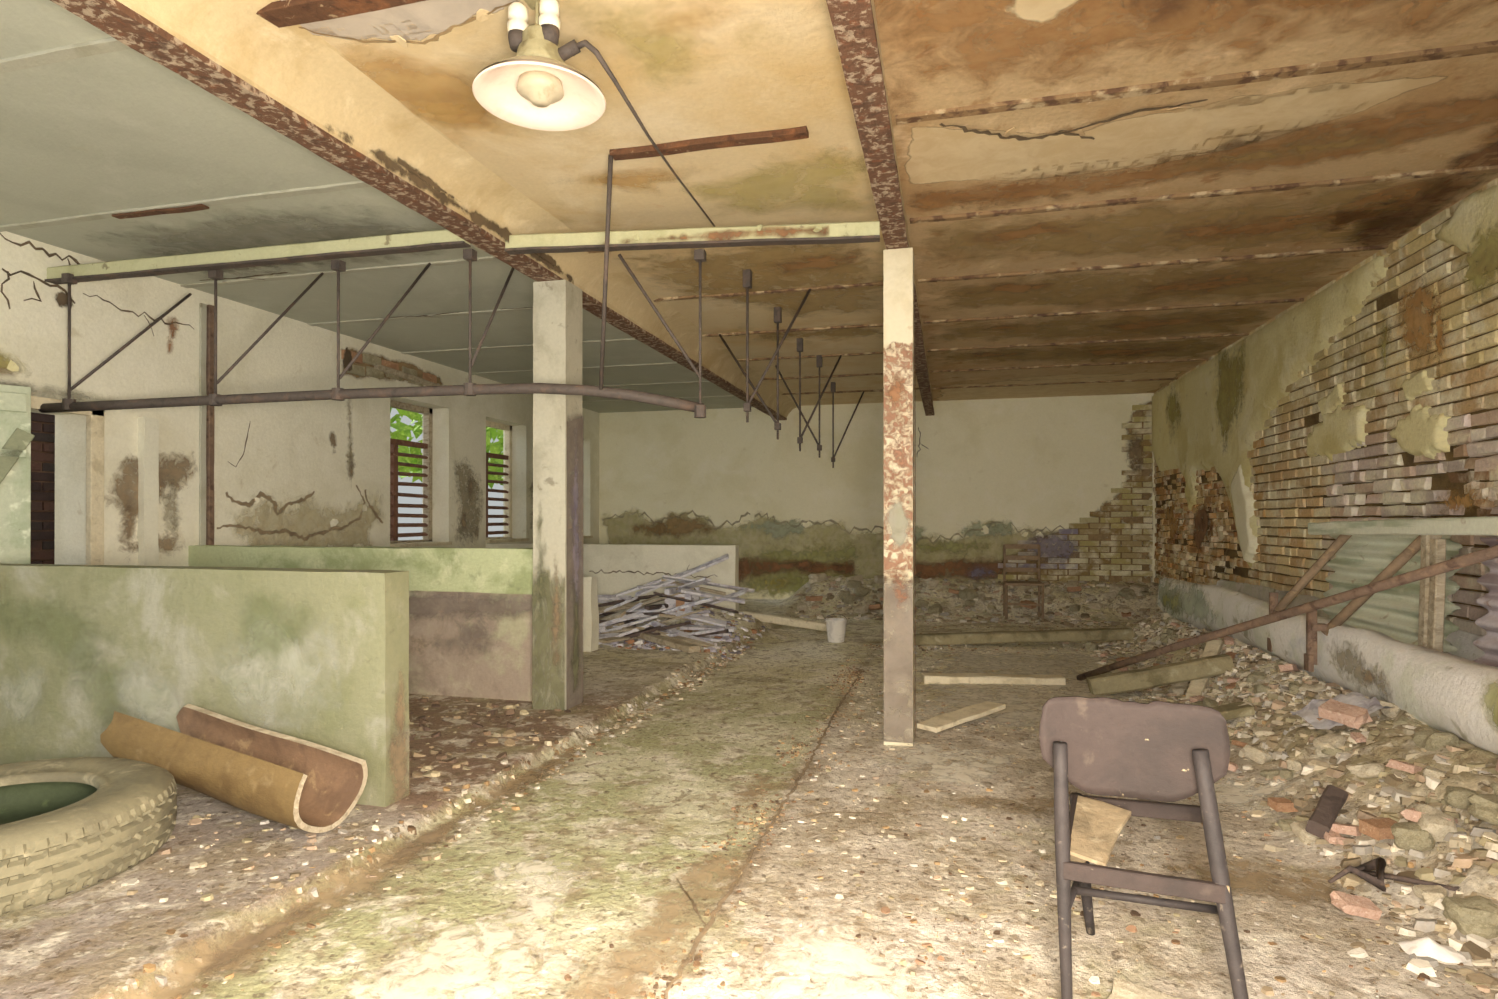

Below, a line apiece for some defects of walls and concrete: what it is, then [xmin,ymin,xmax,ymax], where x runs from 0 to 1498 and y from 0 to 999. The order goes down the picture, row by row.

peeling [299,0,520,48]
crack [0,233,194,336]
damp [912,97,1498,361]
peeling [1435,185,1498,288]
peeling [602,255,1388,592]
peeling [1389,369,1498,517]
peeling [217,485,384,547]